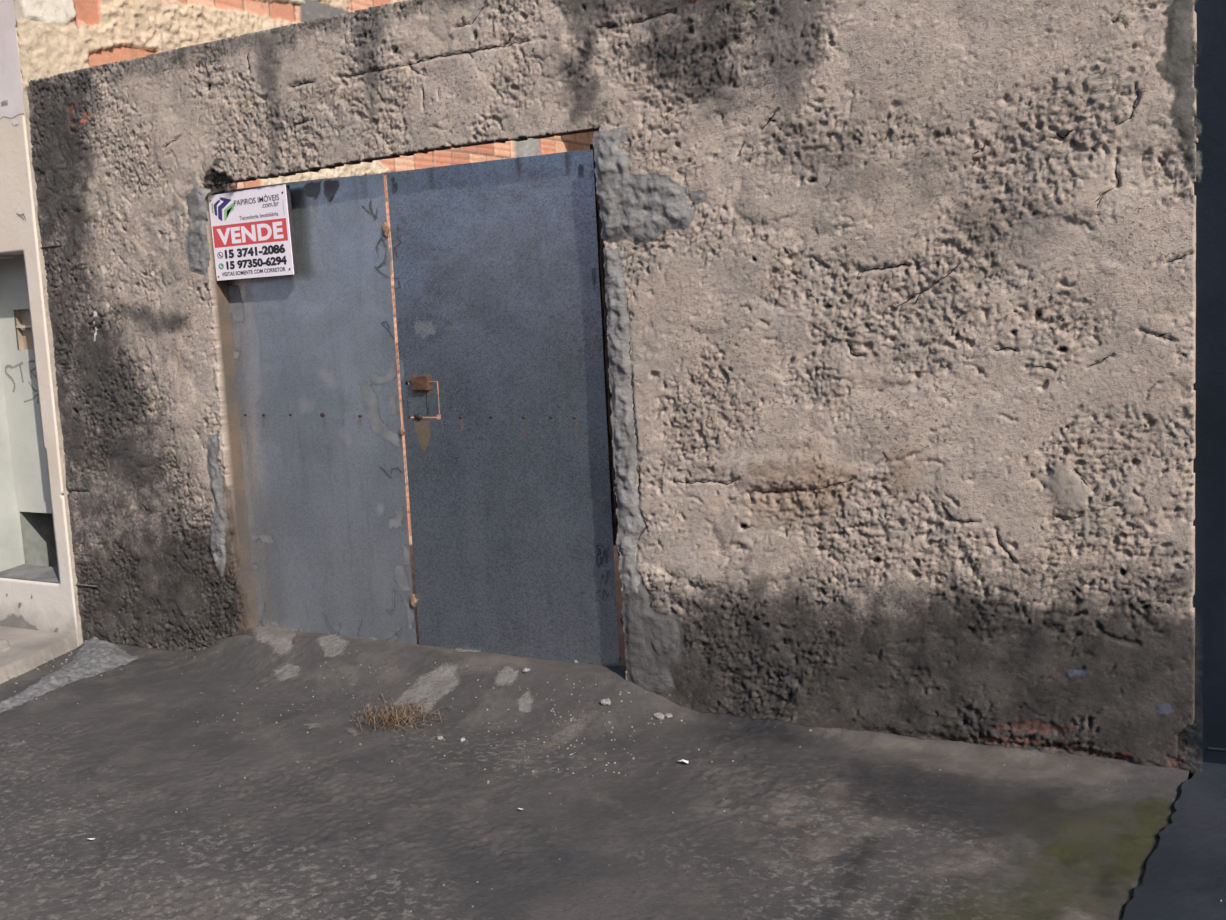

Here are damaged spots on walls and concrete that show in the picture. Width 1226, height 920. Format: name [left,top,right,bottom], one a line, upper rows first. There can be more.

peeling [0,0,24,125]
crack [344,5,546,99]
water stain [562,0,610,117]
water stain [635,0,739,100]
water stain [32,72,94,253]
crack [857,260,964,314]
water stain [50,304,155,485]
crack [669,478,853,501]
water stain [80,532,244,648]
water stain [675,585,1202,773]
flaking render [978,719,1133,760]